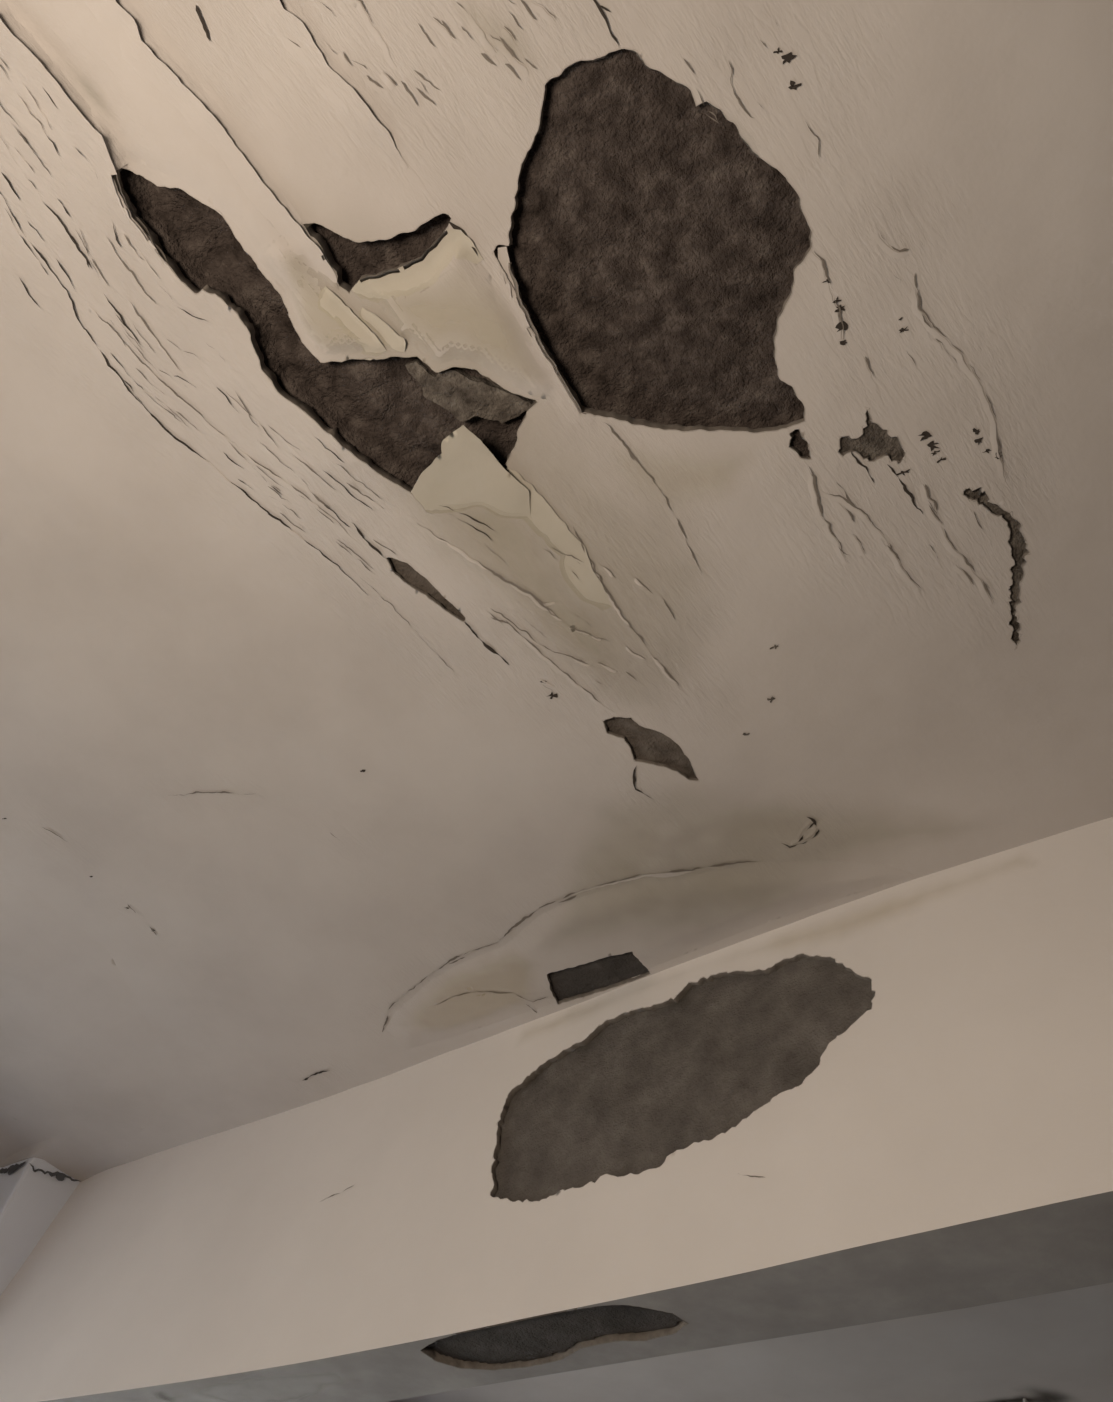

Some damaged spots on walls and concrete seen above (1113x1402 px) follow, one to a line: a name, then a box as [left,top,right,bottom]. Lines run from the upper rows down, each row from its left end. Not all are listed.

spalling [0,0,813,611]
peeling [837,407,910,475]
crack [804,233,1030,649]
spalling [918,431,946,463]
spalling [603,717,700,782]
spalling [490,952,876,1203]
crack [0,1161,79,1181]
spalling [420,1305,688,1370]